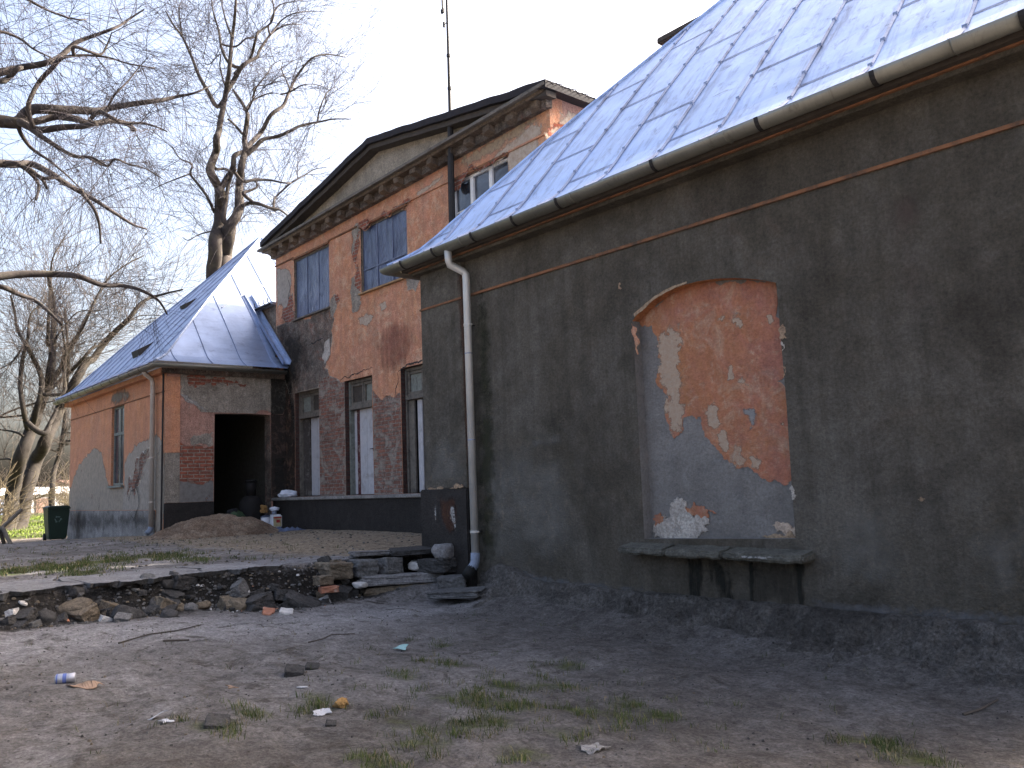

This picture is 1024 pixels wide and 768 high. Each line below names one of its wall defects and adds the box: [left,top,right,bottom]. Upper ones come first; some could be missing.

flaking render [180,175,443,496]
peeling [631,280,796,500]
peeling [69,434,164,533]
flaking render [177,432,214,503]
flaking render [652,497,716,538]
flaking render [762,521,796,538]